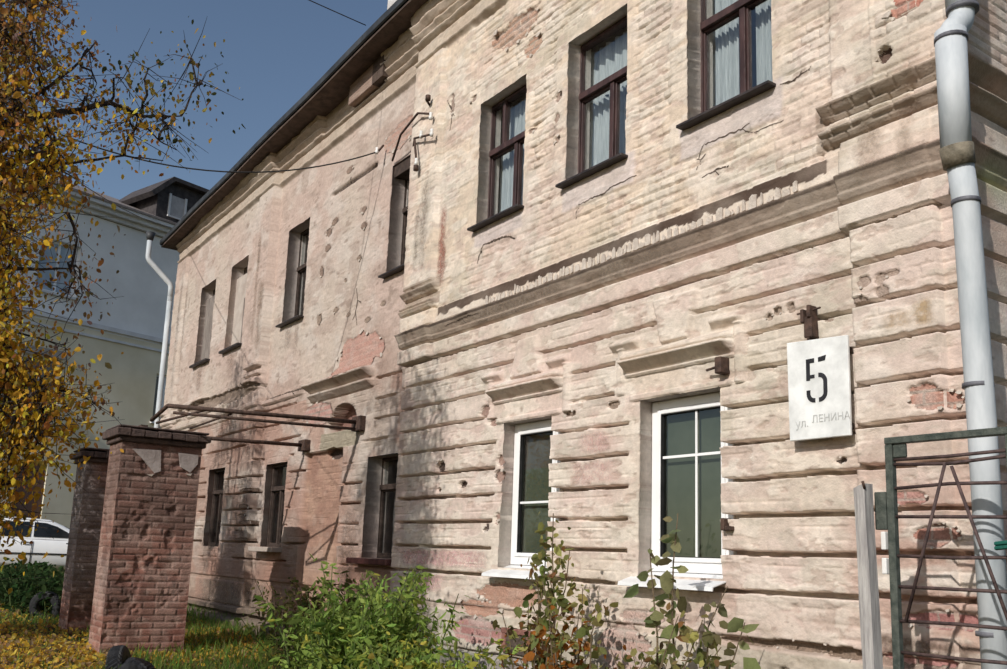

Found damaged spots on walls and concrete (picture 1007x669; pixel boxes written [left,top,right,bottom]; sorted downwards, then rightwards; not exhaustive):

flaking render [881,0,923,21]
flaking render [492,7,543,58]
spalling [876,48,892,64]
crack [696,120,783,178]
crack [576,175,637,218]
crack [477,236,515,264]
spalling [853,270,899,306]
flaking render [327,317,385,378]
flaking render [907,383,965,410]
spalling [494,455,506,483]
flaking render [913,522,963,549]
flaking render [905,609,979,632]